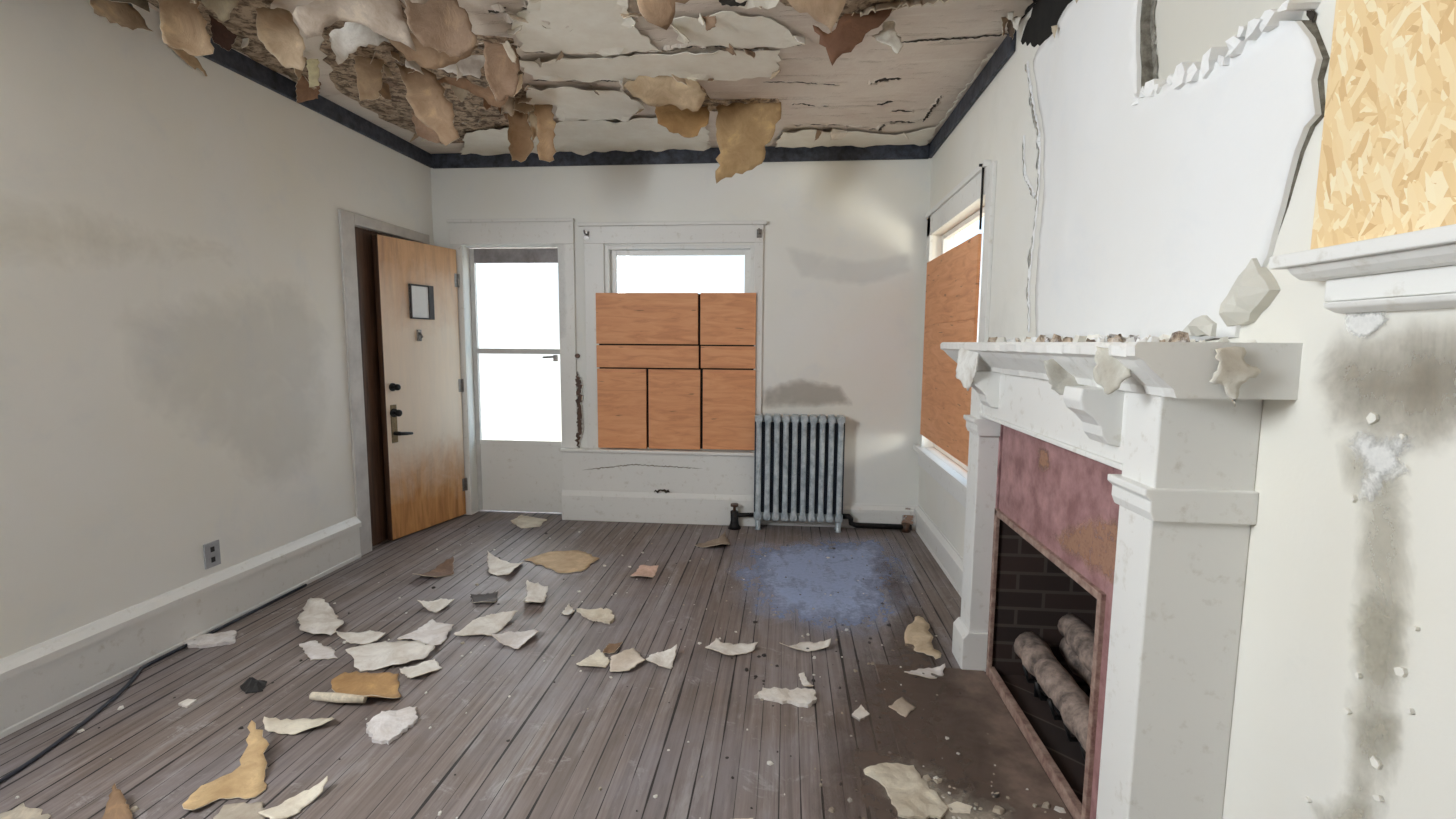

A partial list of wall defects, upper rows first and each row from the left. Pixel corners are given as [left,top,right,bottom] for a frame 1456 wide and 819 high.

peeling [507,0,805,156]
peeling [776,0,1078,148]
spalling [1130,0,1321,106]
crack [1306,10,1315,22]
peeling [460,127,510,156]
crack [478,1,1041,332]
water stain [1340,348,1456,419]